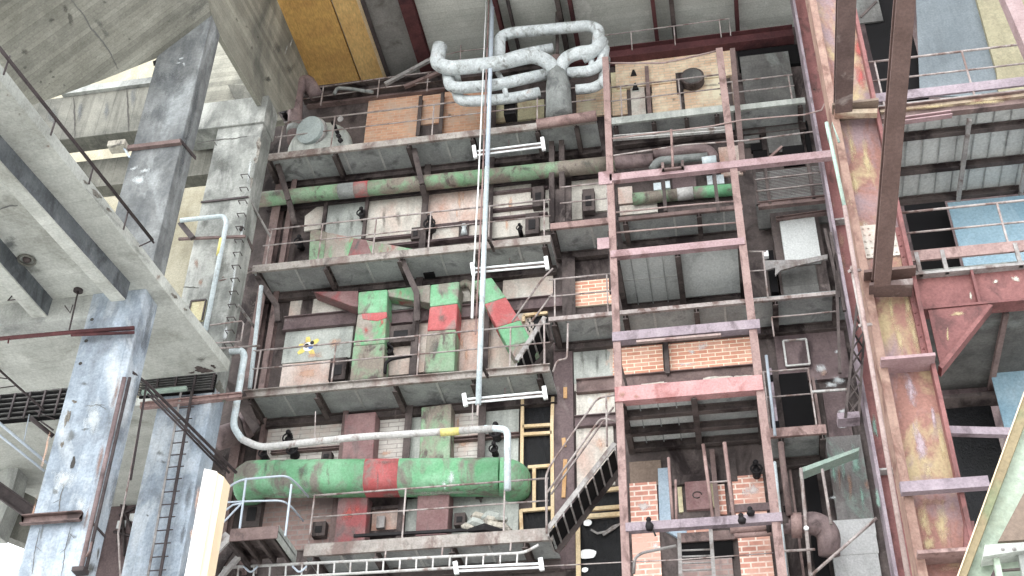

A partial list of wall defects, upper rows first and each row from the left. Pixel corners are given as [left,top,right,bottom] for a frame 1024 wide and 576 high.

crack [71,0,118,69]